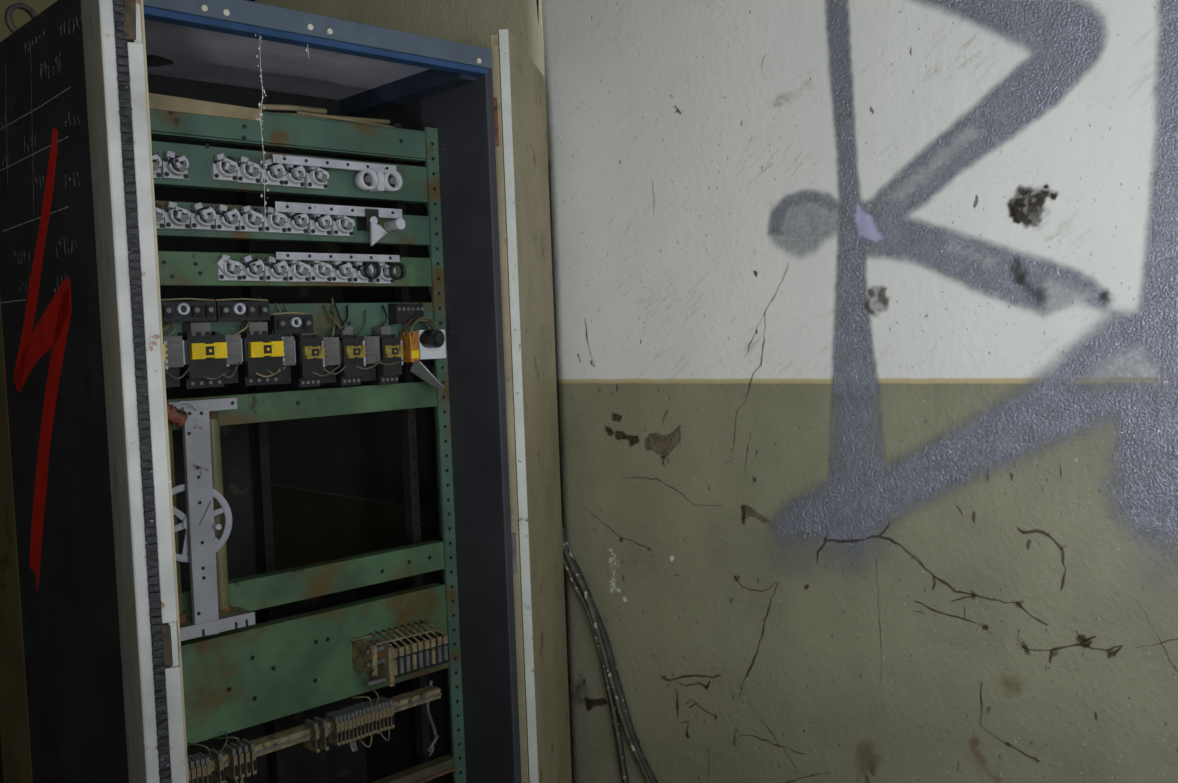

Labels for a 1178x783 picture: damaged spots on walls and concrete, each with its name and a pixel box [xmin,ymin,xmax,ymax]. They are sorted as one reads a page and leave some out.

spalling [1008,185,1057,226]
spalling [866,288,888,314]
crack [724,270,787,471]
peeling [605,413,681,465]
peeling [741,505,769,524]
crack [661,520,1123,783]